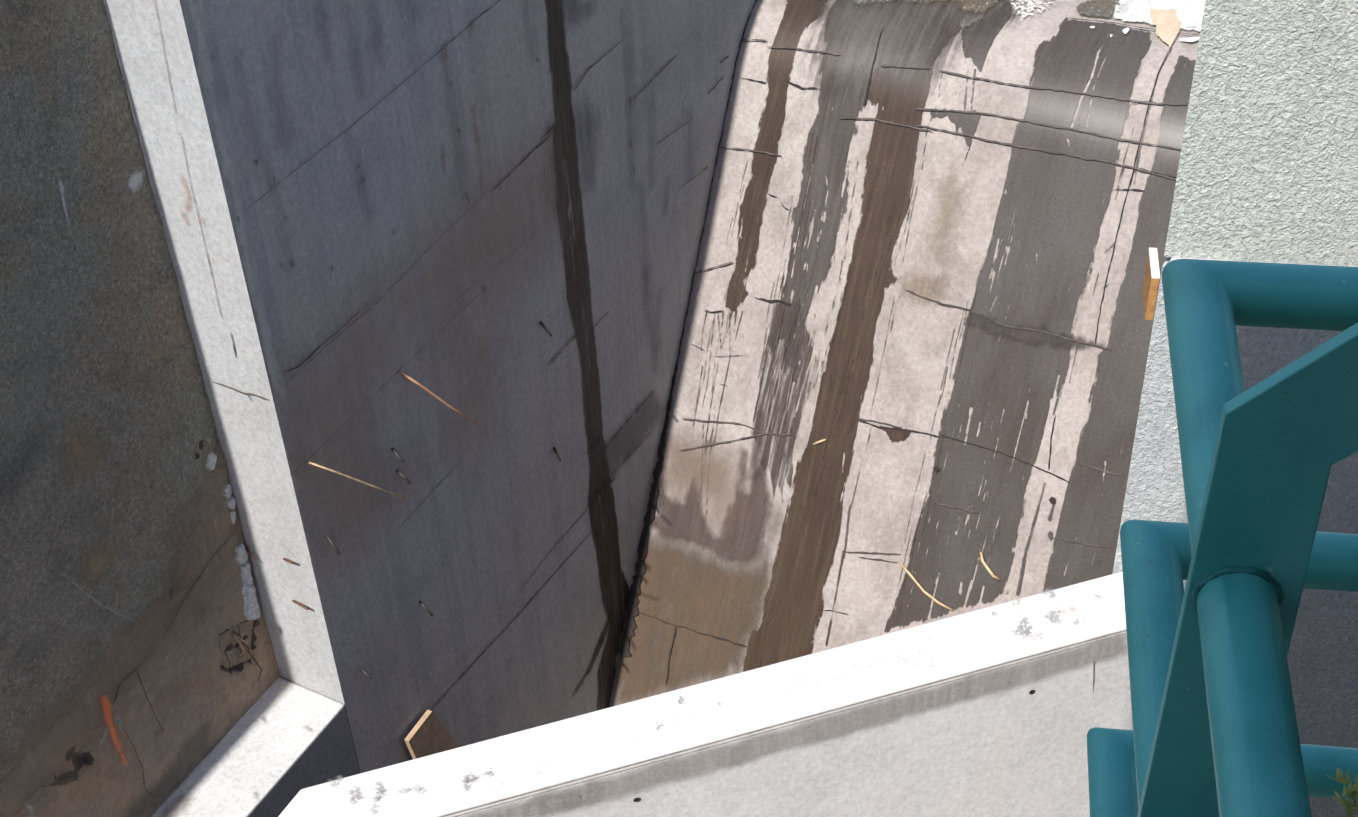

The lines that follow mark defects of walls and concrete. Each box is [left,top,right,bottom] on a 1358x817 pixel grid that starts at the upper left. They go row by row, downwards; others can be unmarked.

water stain [546,0,659,710]
water stain [650,0,1051,672]
water stain [884,0,1205,632]